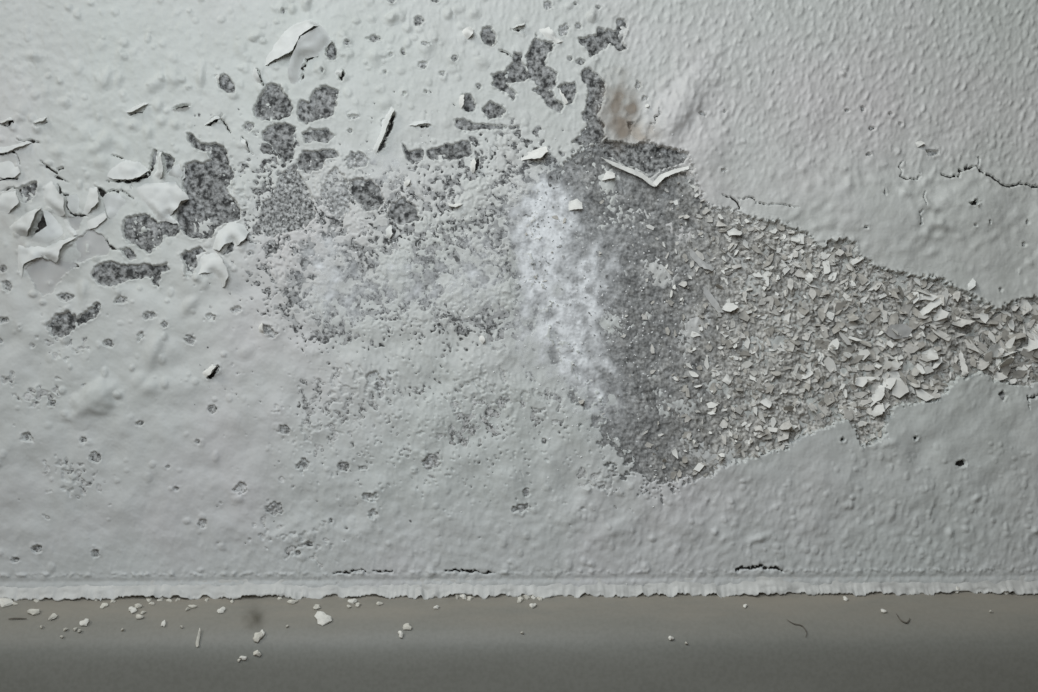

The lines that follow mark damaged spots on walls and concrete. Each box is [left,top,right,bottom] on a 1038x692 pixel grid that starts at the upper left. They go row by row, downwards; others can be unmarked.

flaking render [0,19,1038,516]
crack [898,163,1038,188]